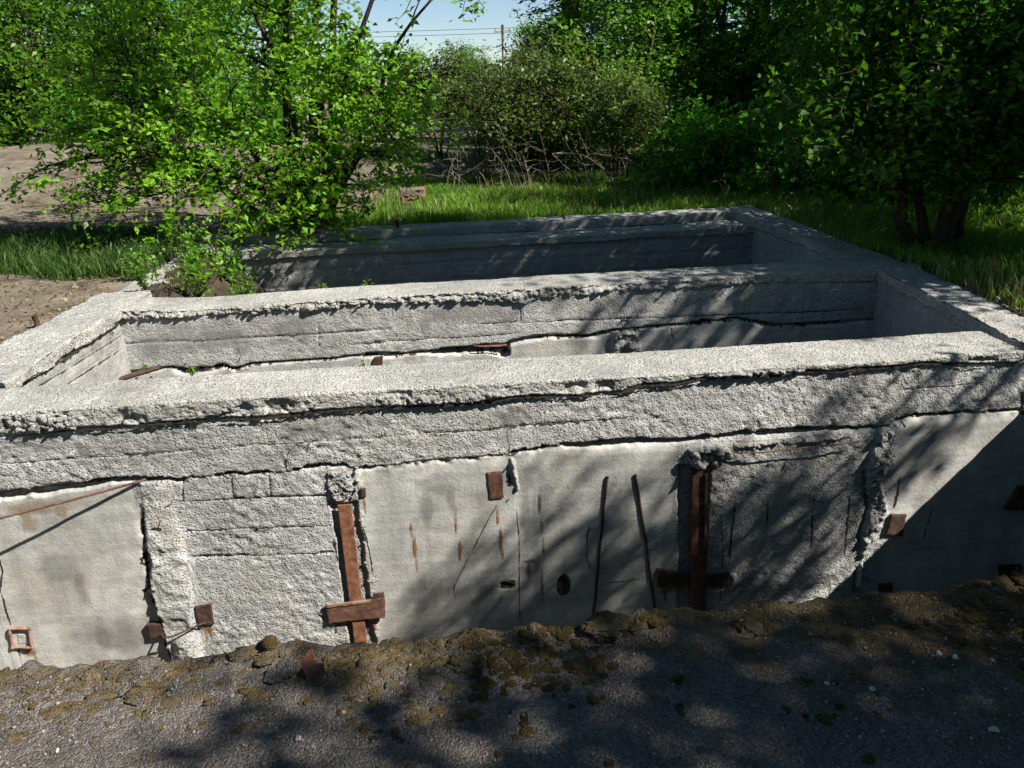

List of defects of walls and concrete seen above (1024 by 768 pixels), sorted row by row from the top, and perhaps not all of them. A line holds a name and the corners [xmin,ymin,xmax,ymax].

crack [22,309,860,387]
crack [0,362,1019,665]
spalling [864,426,896,549]
spalling [150,577,170,649]